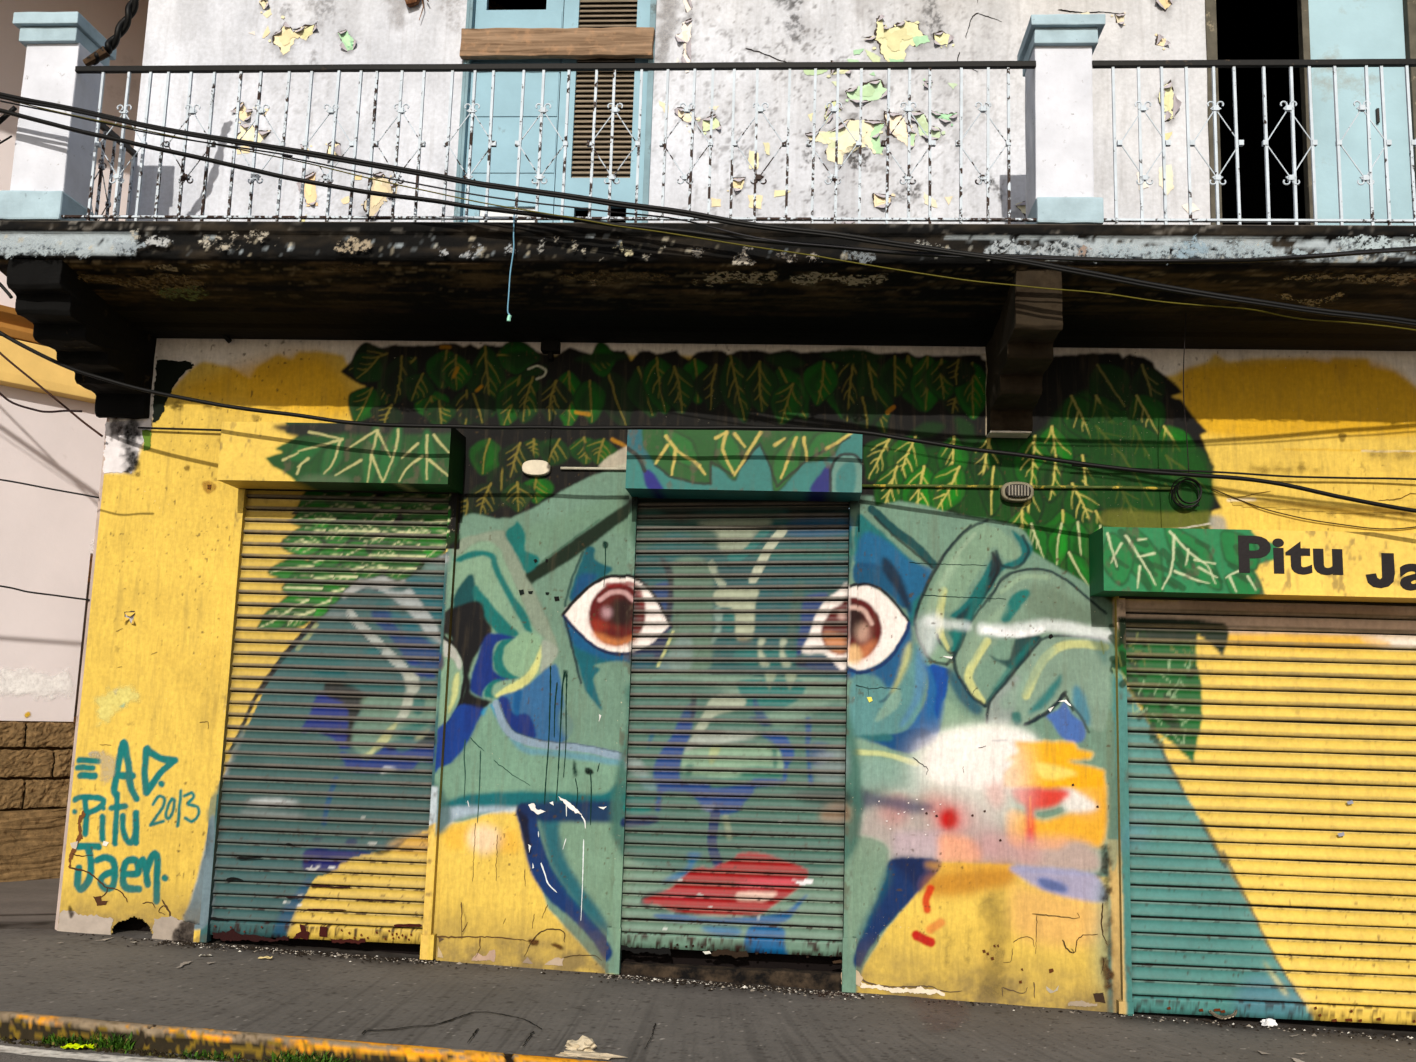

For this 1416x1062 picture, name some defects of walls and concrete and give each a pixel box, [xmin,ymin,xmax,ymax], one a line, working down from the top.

peeling [250,0,317,55]
peeling [338,30,356,51]
peeling [675,0,692,73]
peeling [231,102,271,154]
peeling [659,101,721,134]
peeling [803,15,957,164]
peeling [1158,80,1182,140]
peeling [296,172,318,222]
peeling [711,142,790,209]
peeling [872,193,895,208]
peeling [0,230,268,301]
peeling [324,237,375,273]